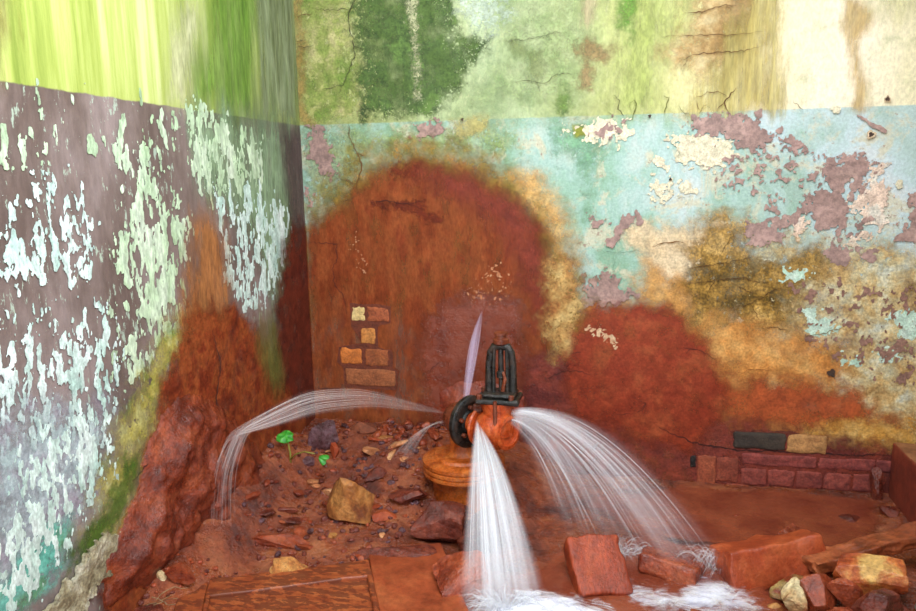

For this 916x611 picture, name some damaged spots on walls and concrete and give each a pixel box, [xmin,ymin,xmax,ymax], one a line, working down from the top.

damp [407,0,421,99]
damp [460,0,512,28]
peeling [561,114,635,151]
crack [664,88,736,113]
crack [666,4,764,69]
damp [845,0,871,111]
peeling [648,109,916,386]
peeling [0,94,292,611]
flaking render [337,303,399,390]
damp [414,291,529,424]
corrosion [149,141,916,493]
peeling [585,324,618,350]